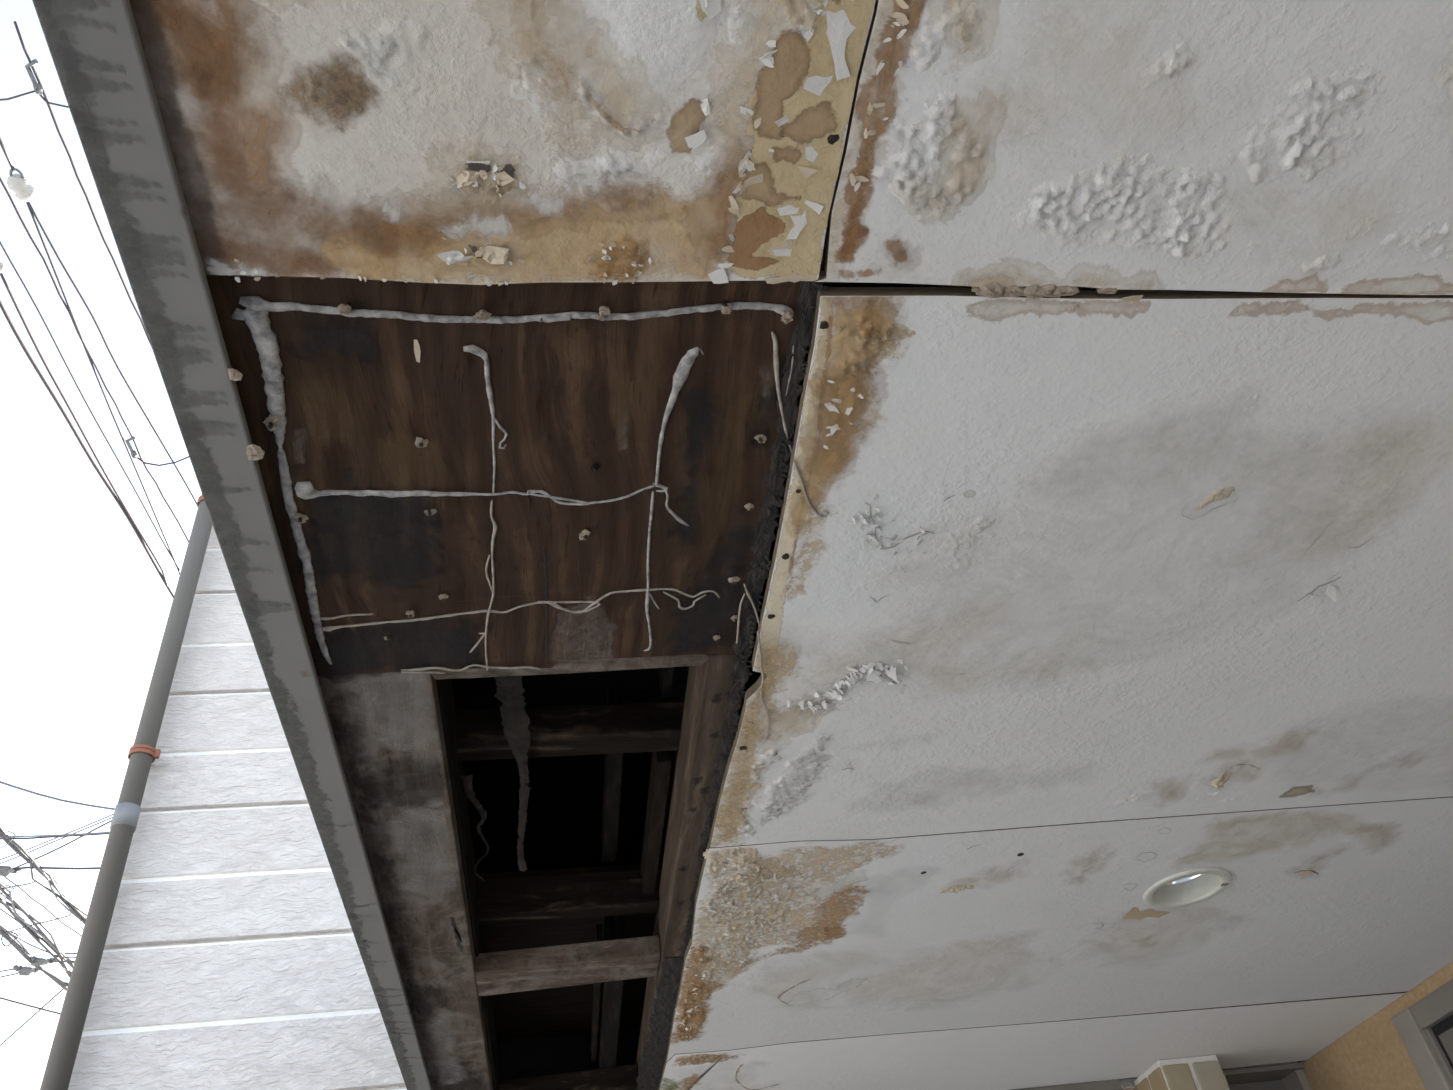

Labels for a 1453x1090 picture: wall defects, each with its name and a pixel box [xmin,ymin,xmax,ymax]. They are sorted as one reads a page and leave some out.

peeling [696,0,721,21]
leakage [129,0,747,283]
peeling [666,98,710,153]
peeling [708,0,874,668]
peeling [1122,295,1143,303]
leakage [670,382,778,543]
leakage [789,303,906,591]
leakage [670,653,908,1090]
peeling [1124,908,1169,920]